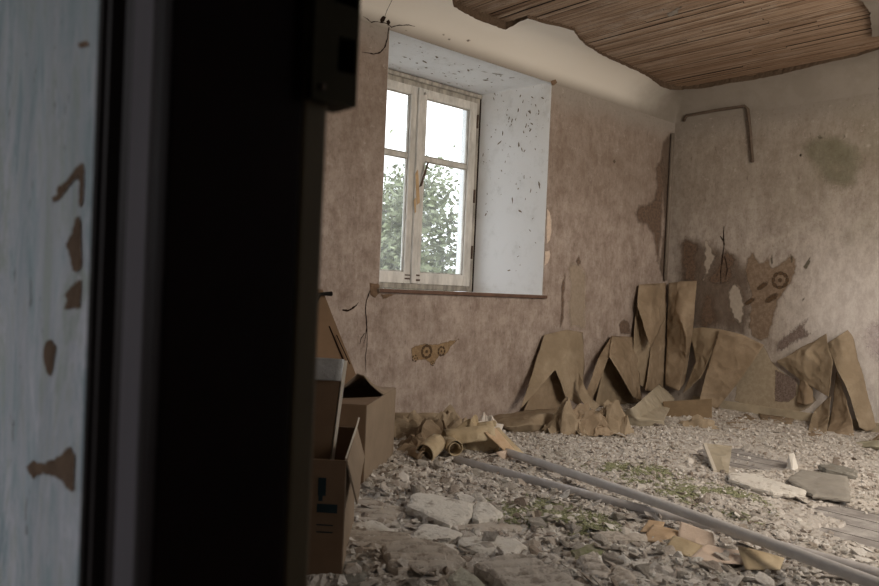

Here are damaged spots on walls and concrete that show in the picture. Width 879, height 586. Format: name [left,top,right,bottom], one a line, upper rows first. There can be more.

spalling [452,0,879,90]
peeling [52,163,84,309]
peeling [637,164,663,256]
peeling [43,340,56,377]
peeling [411,339,459,366]
peeling [681,240,816,411]
peeling [26,447,75,492]